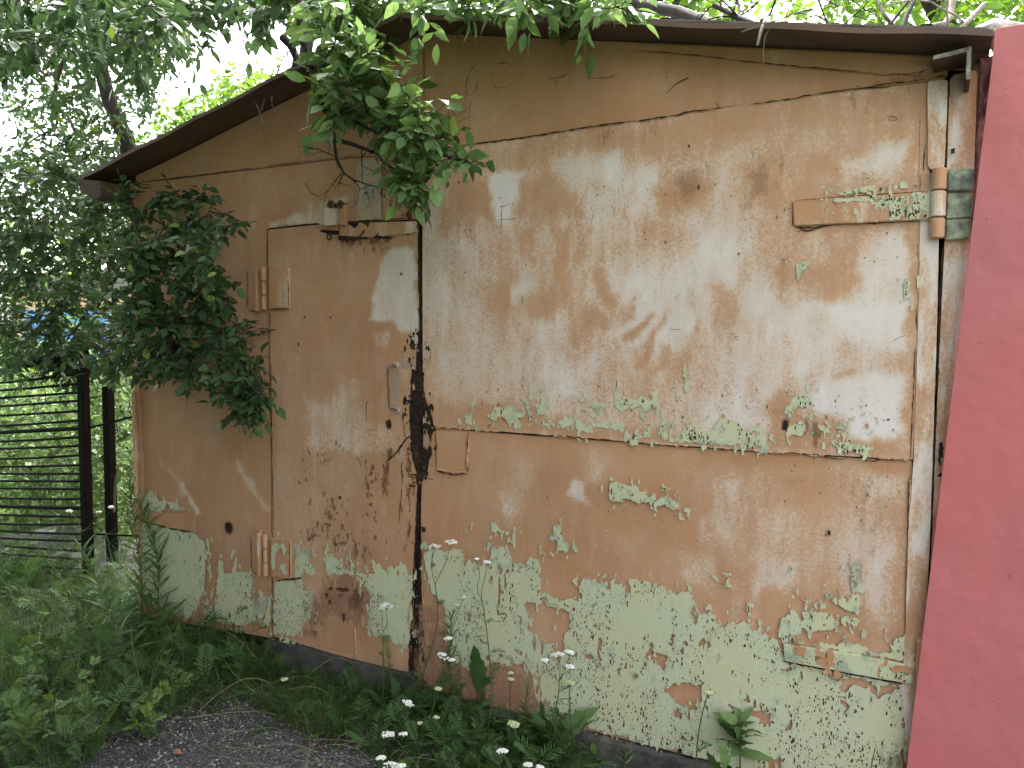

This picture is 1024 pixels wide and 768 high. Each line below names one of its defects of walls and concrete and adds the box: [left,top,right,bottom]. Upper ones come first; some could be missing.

peeling [138,488,916,768]